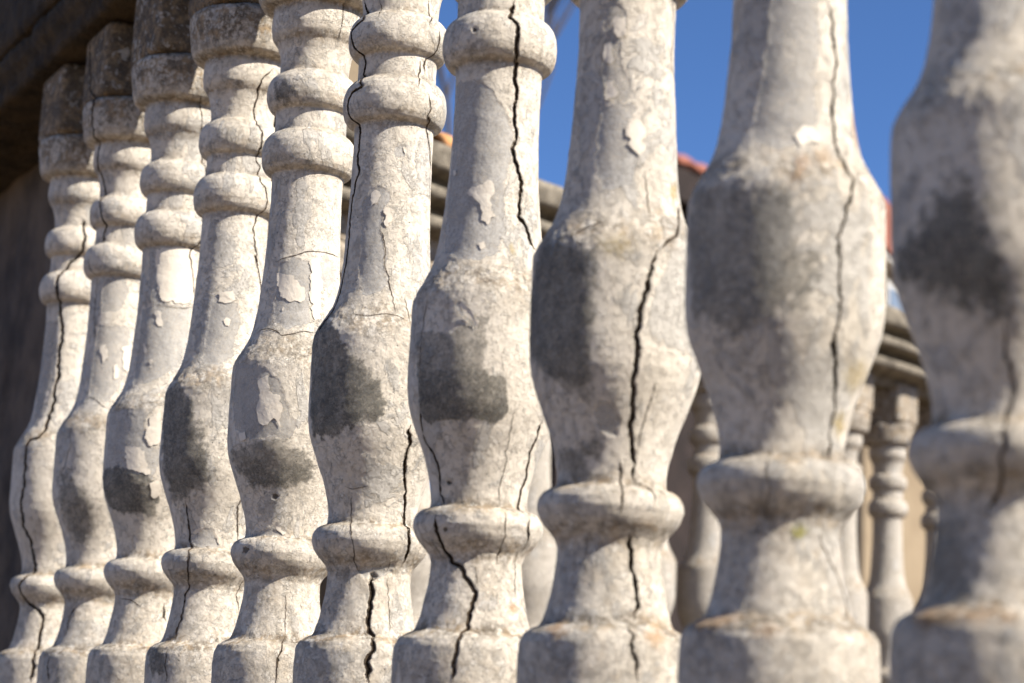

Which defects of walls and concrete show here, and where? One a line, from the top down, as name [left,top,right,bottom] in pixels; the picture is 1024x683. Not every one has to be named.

crack [18,39,108,682]
peeling [203,291,296,441]
peeling [273,256,336,329]
leakage [310,324,387,441]
crack [252,0,542,683]
leakage [418,358,509,424]
peeling [444,80,512,260]
leakage [529,244,595,390]
crack [619,207,680,510]
crack [827,0,855,461]
leakage [237,455,313,488]
crack [626,534,640,681]